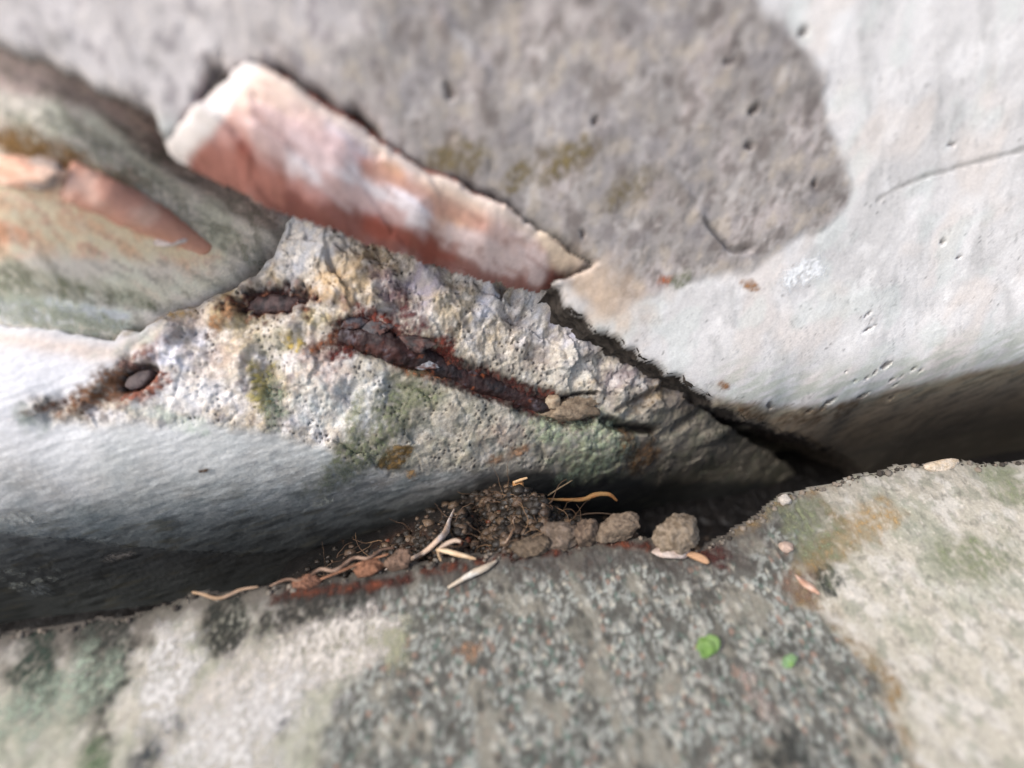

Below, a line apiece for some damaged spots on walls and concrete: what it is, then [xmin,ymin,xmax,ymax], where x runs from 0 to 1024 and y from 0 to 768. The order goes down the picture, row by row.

crack [875,148,1024,203]
spalling [20,48,801,486]
rust [209,283,318,329]
rust [35,346,172,416]
rust [303,289,593,431]
crack [537,286,861,476]
spalling [844,360,896,399]